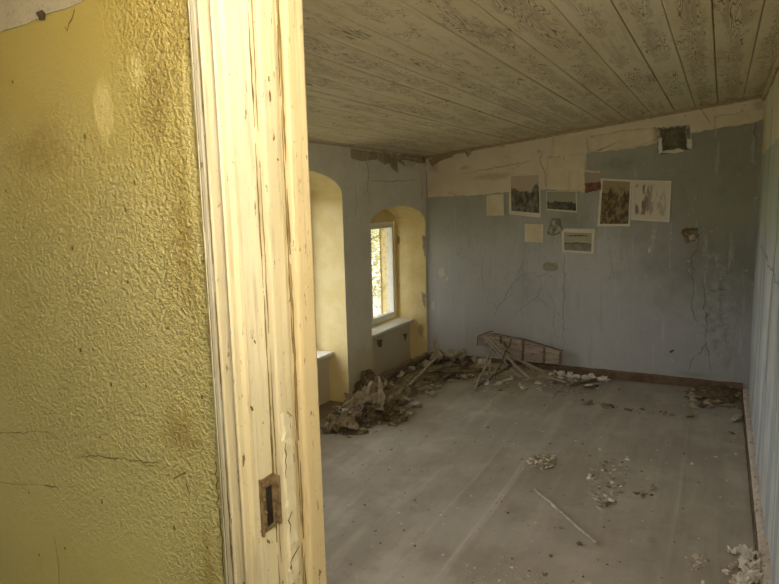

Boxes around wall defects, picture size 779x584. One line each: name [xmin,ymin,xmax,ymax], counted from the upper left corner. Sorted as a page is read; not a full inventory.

crack [75,450,159,467]